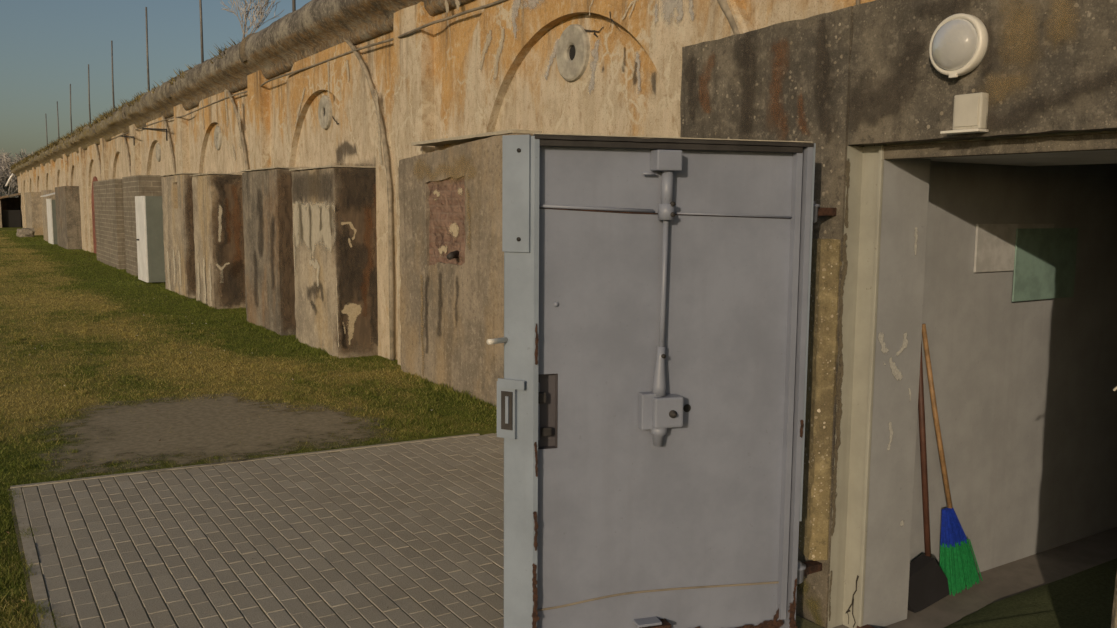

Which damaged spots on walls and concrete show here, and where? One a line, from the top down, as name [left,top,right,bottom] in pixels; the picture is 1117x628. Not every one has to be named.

spalling [428,177,466,265]
corrosion [737,578,797,628]